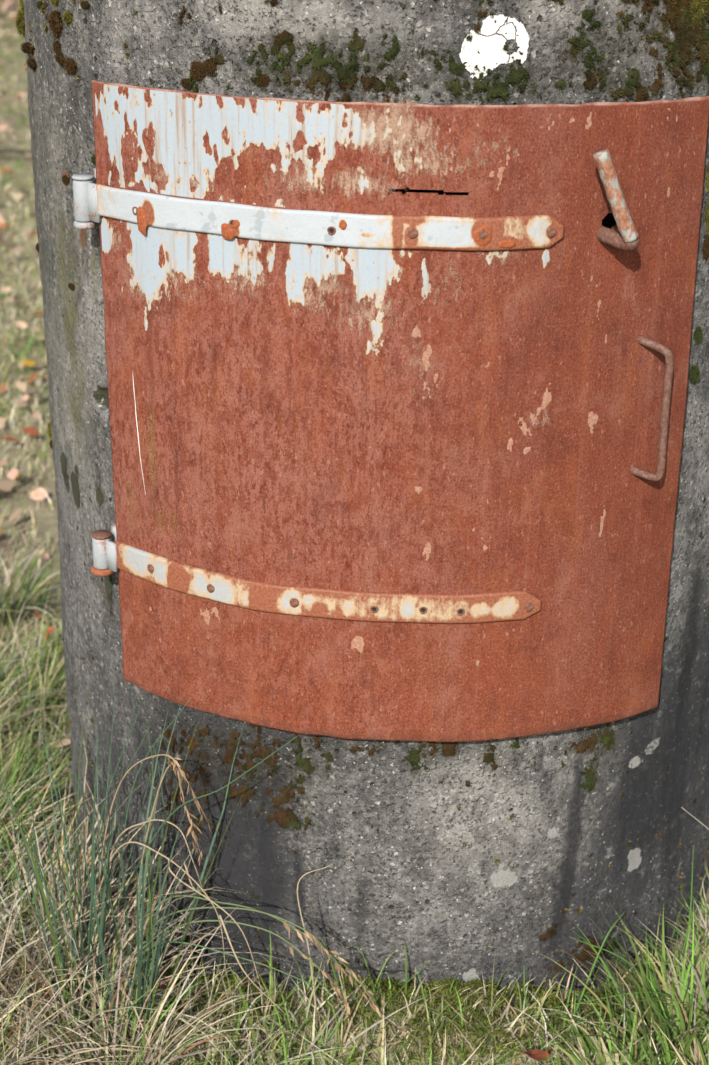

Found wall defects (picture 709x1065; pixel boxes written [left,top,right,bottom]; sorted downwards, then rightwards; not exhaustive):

peeling [95,84,458,207]
peeling [483,143,519,191]
rust [137,206,147,236]
rust [221,220,240,240]
rust [474,224,516,248]
peeling [482,250,510,265]
peeling [542,249,550,269]
peeling [101,217,446,356]
damp [623,705,685,851]
damp [556,764,581,919]